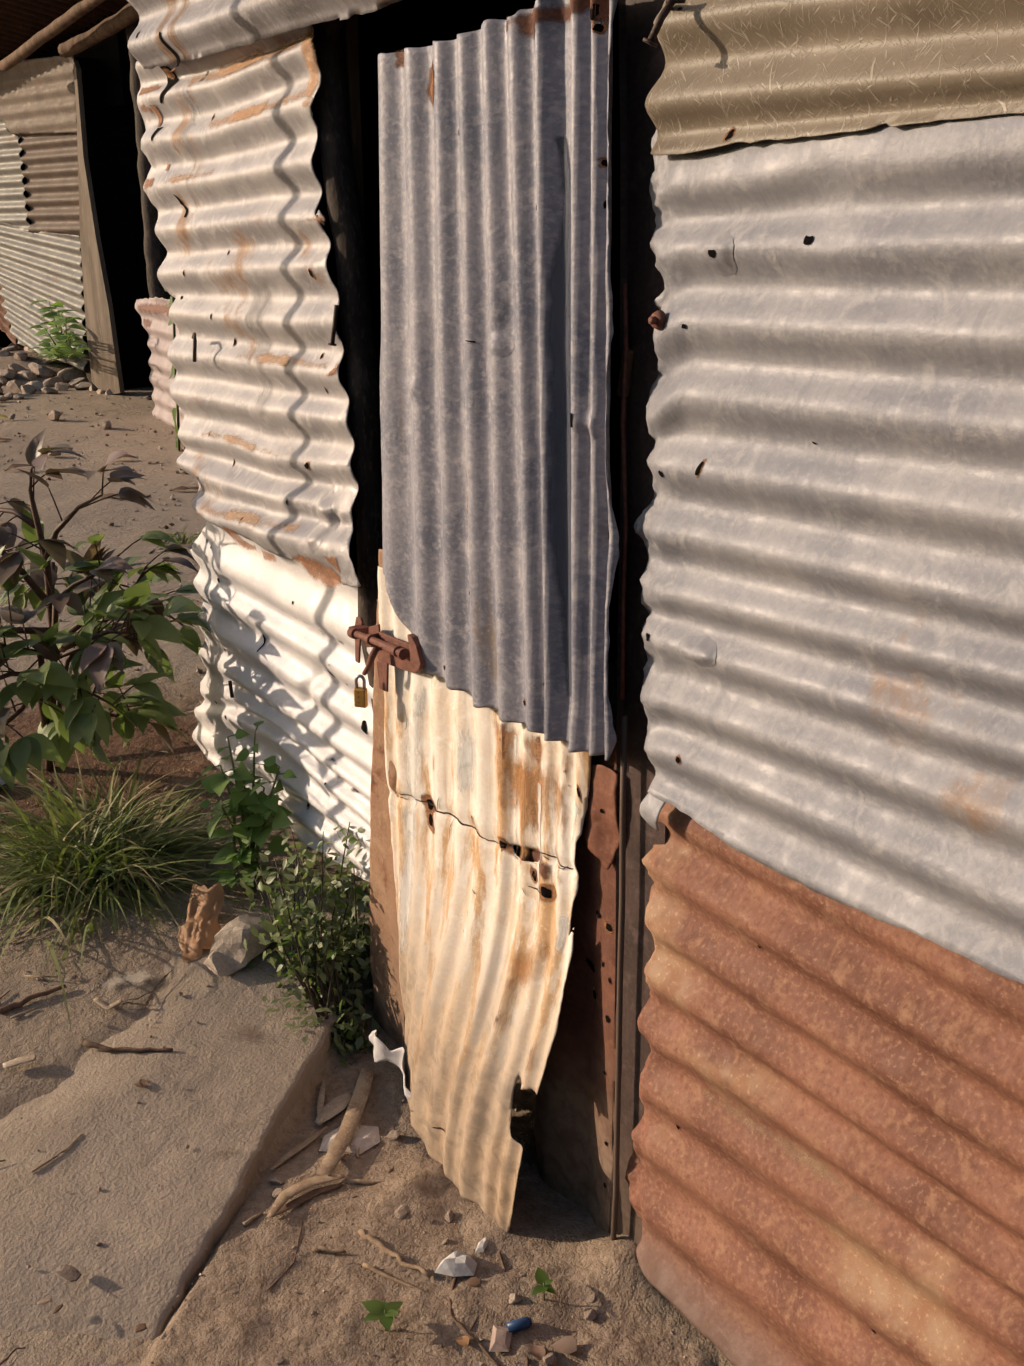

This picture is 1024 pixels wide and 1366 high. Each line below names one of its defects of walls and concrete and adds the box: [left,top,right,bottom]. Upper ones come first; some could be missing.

corrosion [506,0,609,36]
corrosion [191,30,318,125]
corrosion [139,85,161,113]
corrosion [257,354,302,366]
corrosion [208,433,255,467]
corrosion [421,794,436,834]
corrosion [496,724,582,902]
corrosion [496,956,532,1024]